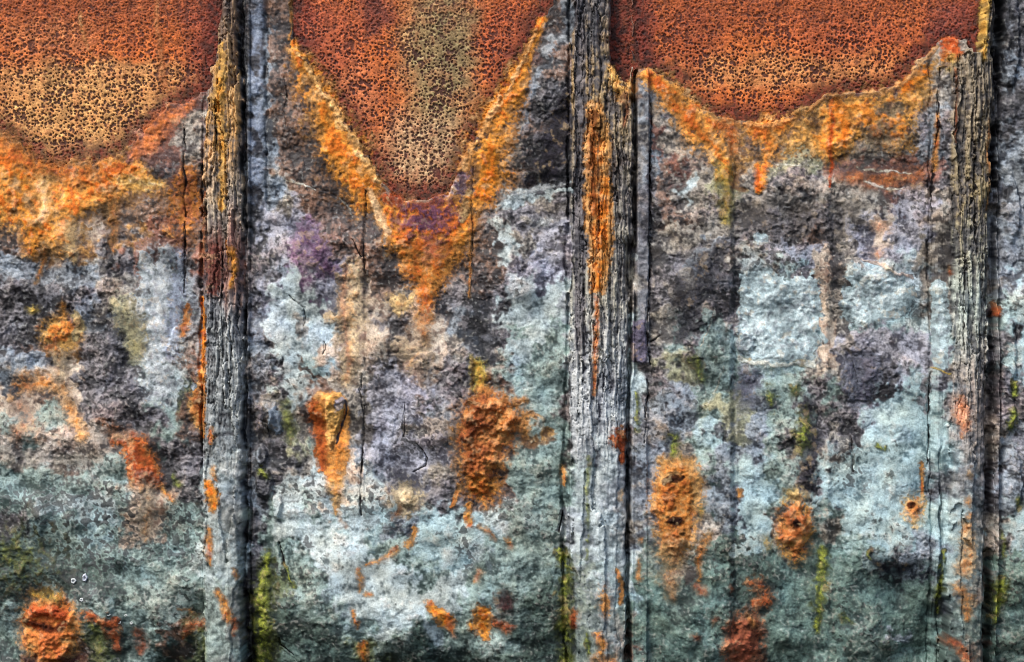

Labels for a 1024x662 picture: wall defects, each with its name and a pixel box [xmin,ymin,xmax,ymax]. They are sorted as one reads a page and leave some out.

corrosion [975,0,992,60]
corrosion [608,36,964,224]
corrosion [283,0,548,374]
corrosion [0,0,238,445]
corrosion [582,100,616,396]
corrosion [102,423,173,541]
corrosion [204,466,221,513]
corrosion [205,527,213,566]
corrosion [215,588,242,636]
corrosion [694,531,712,595]
corrosion [731,574,776,611]